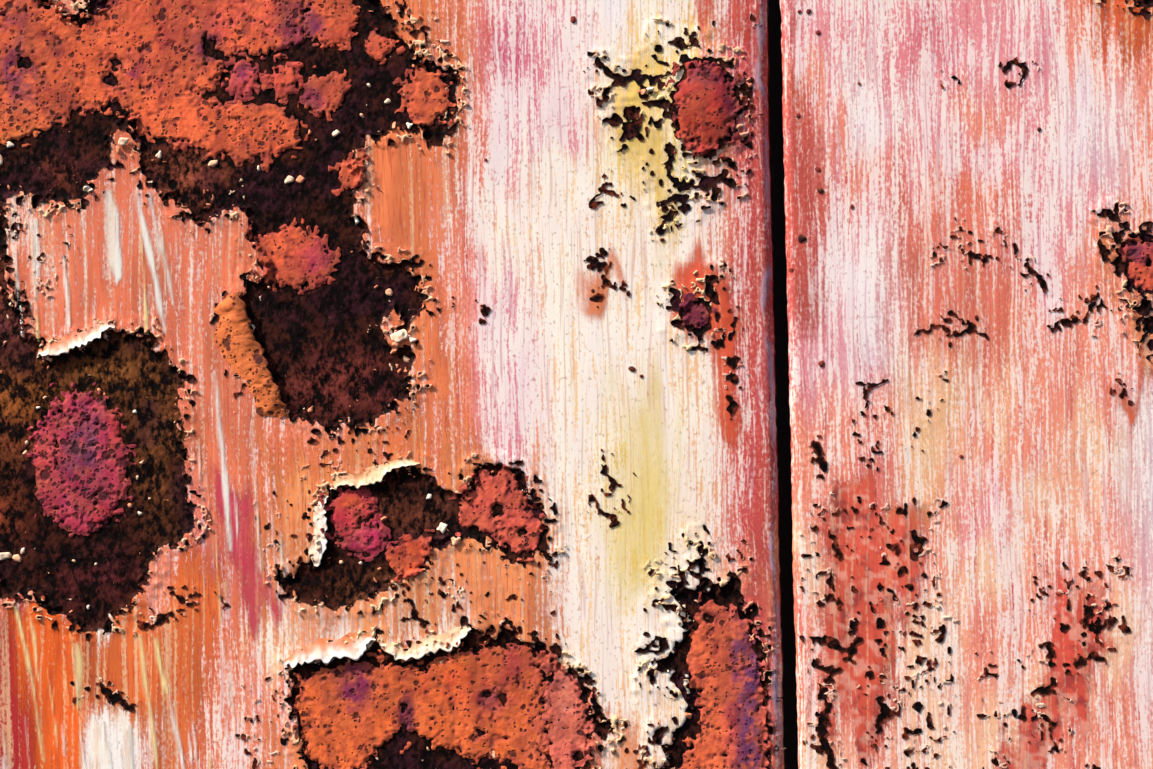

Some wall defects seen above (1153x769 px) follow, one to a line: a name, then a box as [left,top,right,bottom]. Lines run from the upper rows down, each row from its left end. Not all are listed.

corrosion [1087,0,1153,65]
corrosion [0,0,786,769]
corrosion [783,77,824,341]
corrosion [1092,201,1153,390]
corrosion [1115,386,1137,424]
corrosion [817,464,929,766]
corrosion [996,574,1113,769]